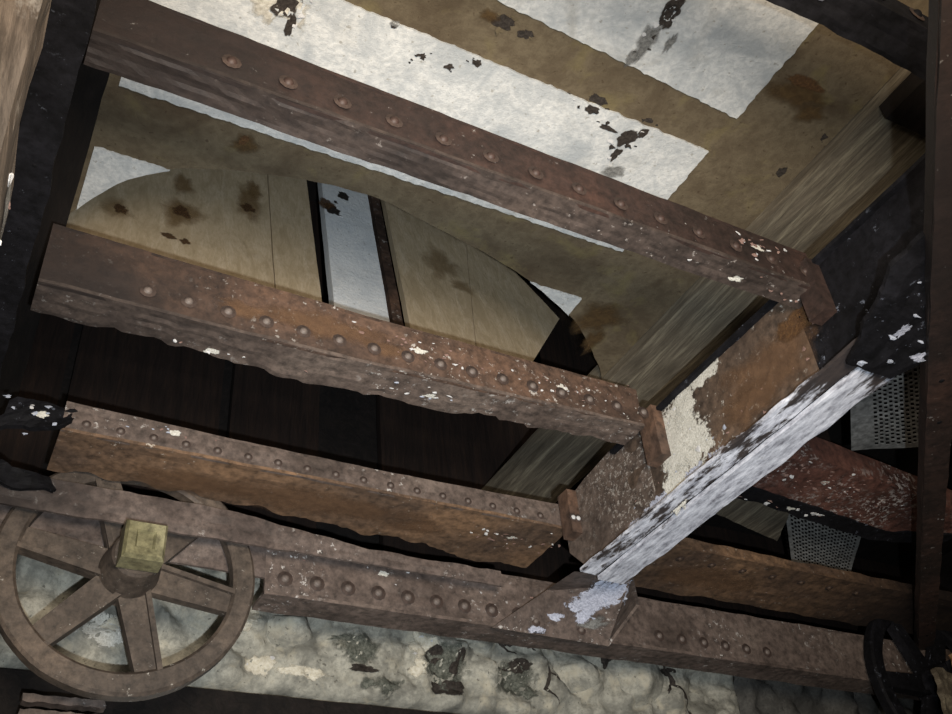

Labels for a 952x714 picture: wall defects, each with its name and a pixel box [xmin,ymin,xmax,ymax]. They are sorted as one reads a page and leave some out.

spalling [251,0,313,36]
peeling [625,0,689,66]
leakage [768,74,825,121]
peeling [567,92,658,177]
corrosion [767,461,866,499]